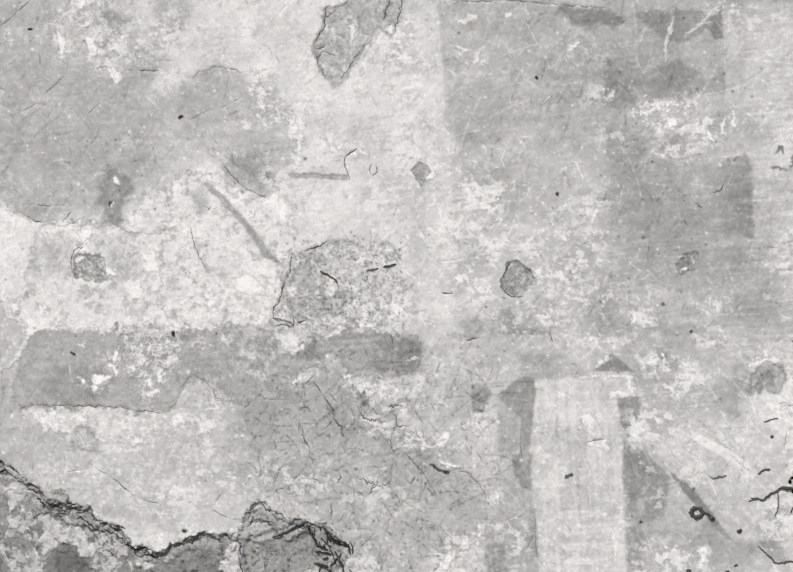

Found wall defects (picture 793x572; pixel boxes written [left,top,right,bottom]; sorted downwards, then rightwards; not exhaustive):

flaking render [312,0,404,87]
flaking render [0,460,353,572]